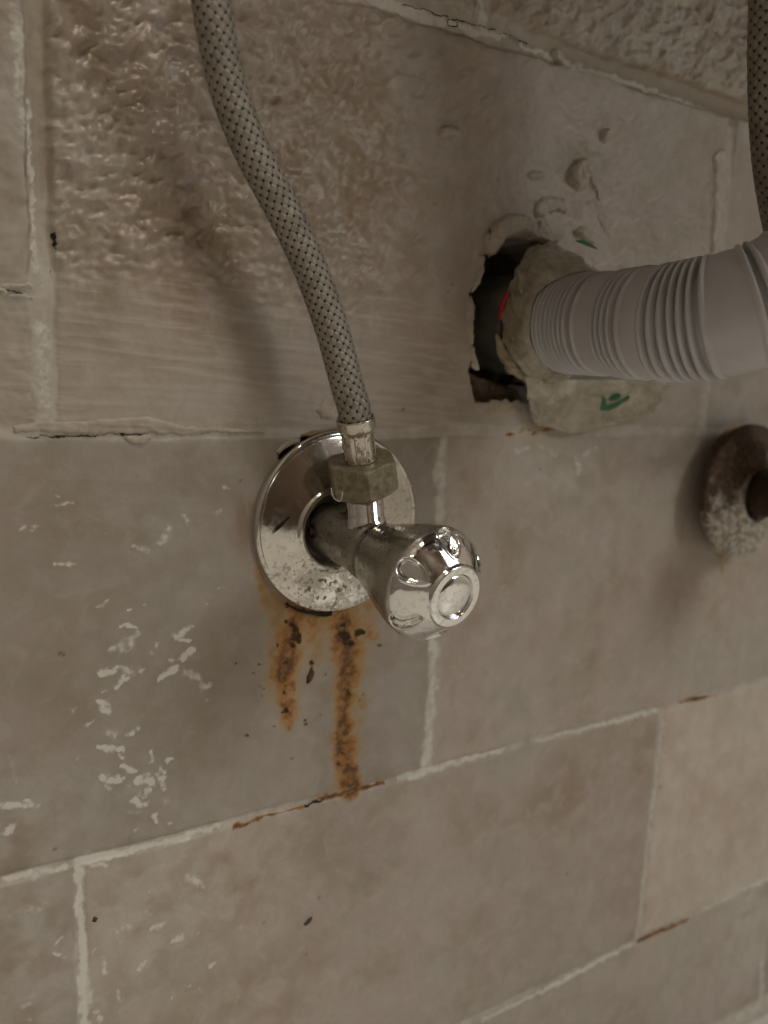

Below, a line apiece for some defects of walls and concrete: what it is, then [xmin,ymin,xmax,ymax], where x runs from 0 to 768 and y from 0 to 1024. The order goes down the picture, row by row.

spalling [465,214,597,403]
corrosion [230,557,387,832]